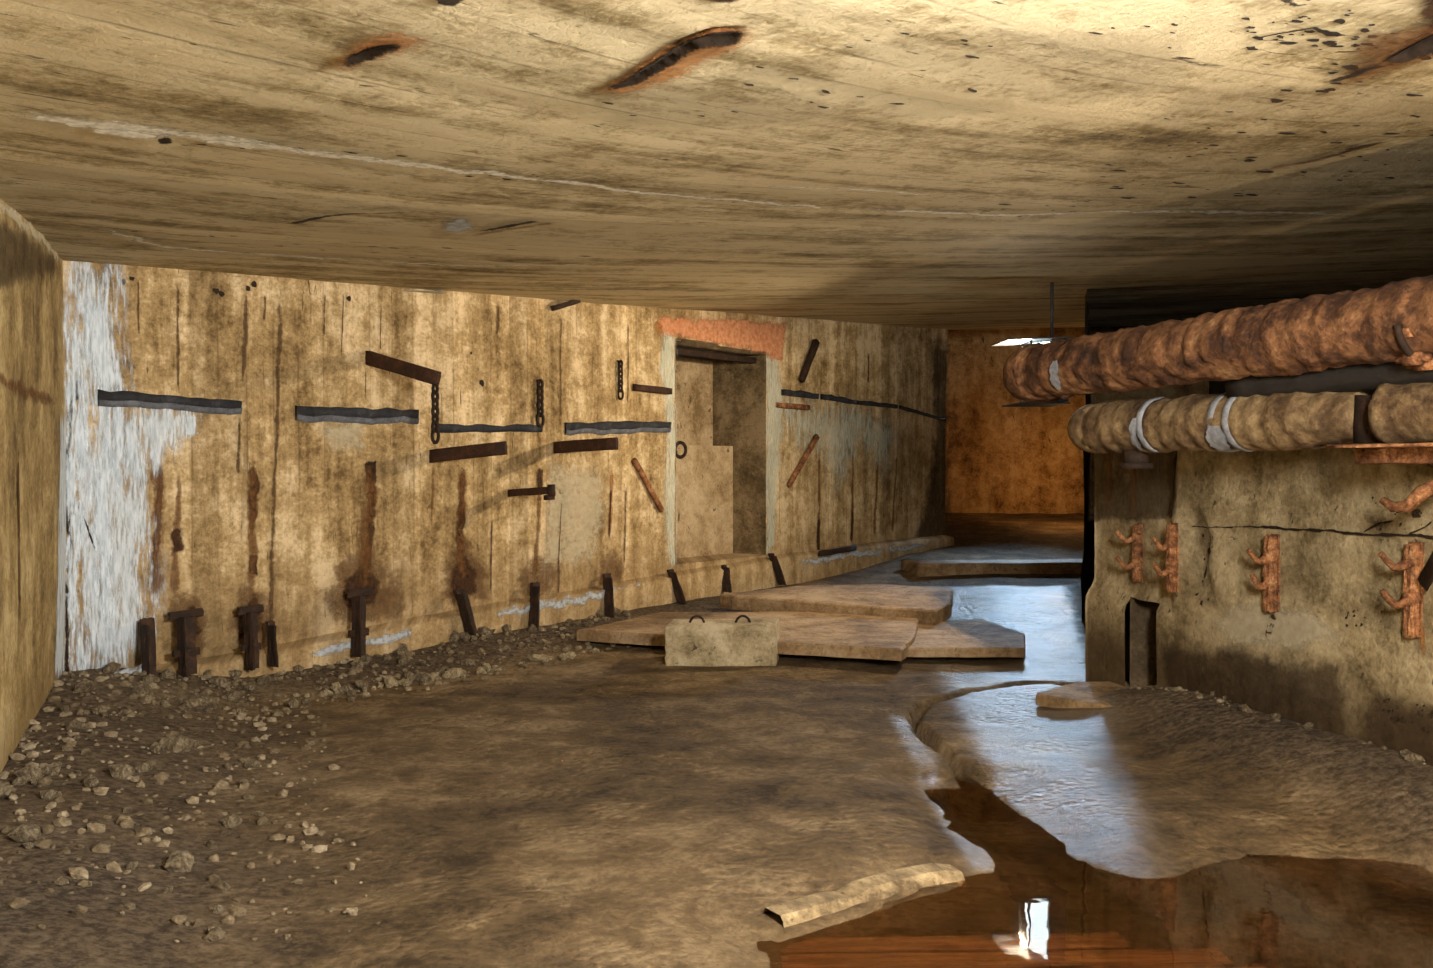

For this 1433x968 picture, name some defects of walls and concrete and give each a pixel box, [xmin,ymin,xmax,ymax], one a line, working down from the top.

corrosion [1421,0,1433,28]
leakage [0,225,196,678]
efflorescence [312,630,412,657]